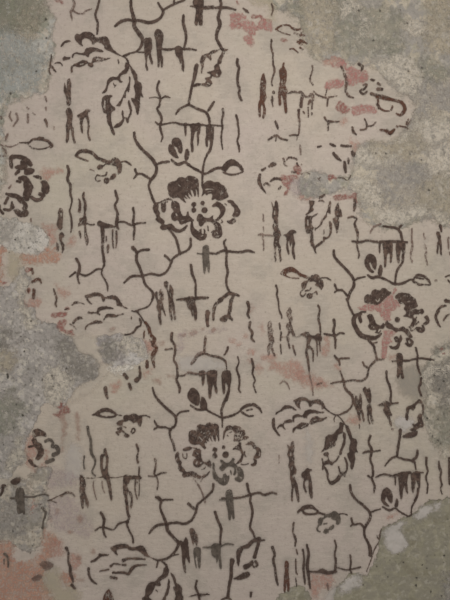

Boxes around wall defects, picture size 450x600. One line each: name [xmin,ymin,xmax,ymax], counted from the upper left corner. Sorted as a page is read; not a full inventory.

flaking render [273,0,450,229]
flaking render [0,217,49,256]
flaking render [0,267,155,554]
flaking render [420,343,450,458]
flaking render [334,497,450,600]